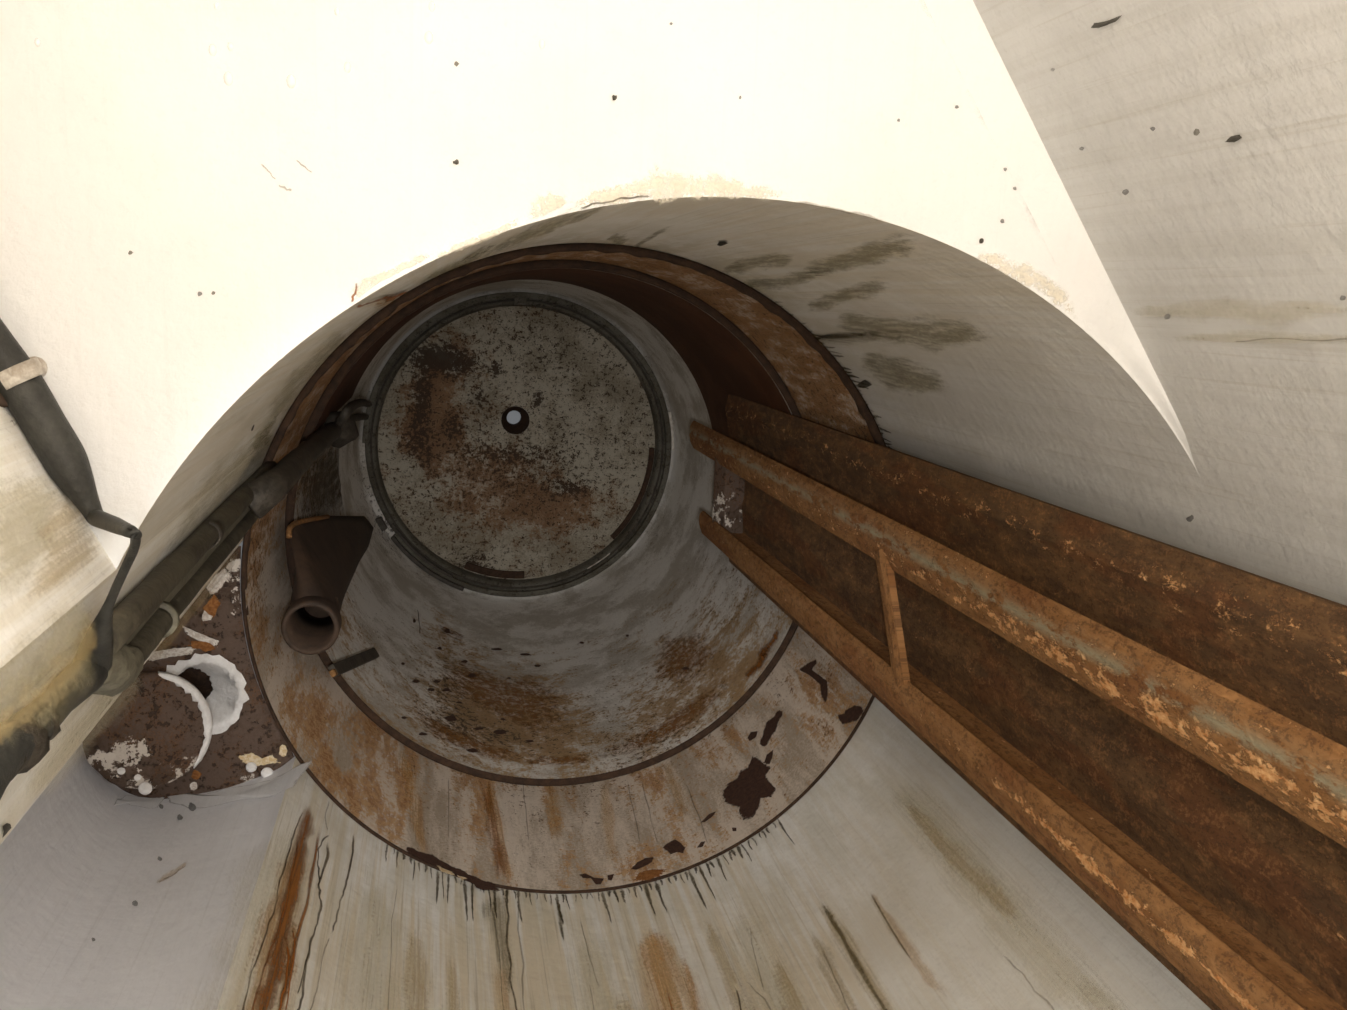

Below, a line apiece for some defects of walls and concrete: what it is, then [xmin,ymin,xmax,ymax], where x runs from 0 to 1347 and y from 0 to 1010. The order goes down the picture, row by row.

spalling [1091,15,1122,28]
damp [750,287,892,449]
rust [425,714,585,765]
rust [449,664,566,732]
rust [608,682,724,756]
rust [655,634,713,680]
rust [746,630,779,676]
peeling [800,660,828,702]
peeling [838,705,863,724]
rust [252,810,319,1010]
crack [243,817,354,1010]